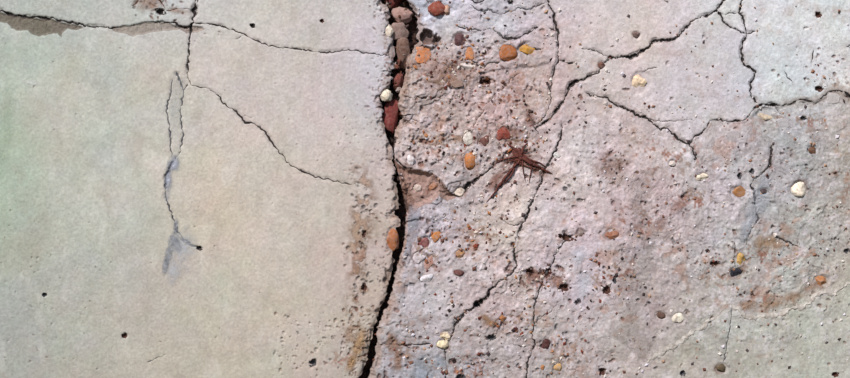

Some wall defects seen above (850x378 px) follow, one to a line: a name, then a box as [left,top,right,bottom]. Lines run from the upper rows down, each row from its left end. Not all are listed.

spalling [0,12,83,36]
crack [0,10,117,29]
spalling [113,22,204,36]
crack [148,0,442,378]
crack [430,160,506,197]
crack [444,0,850,378]